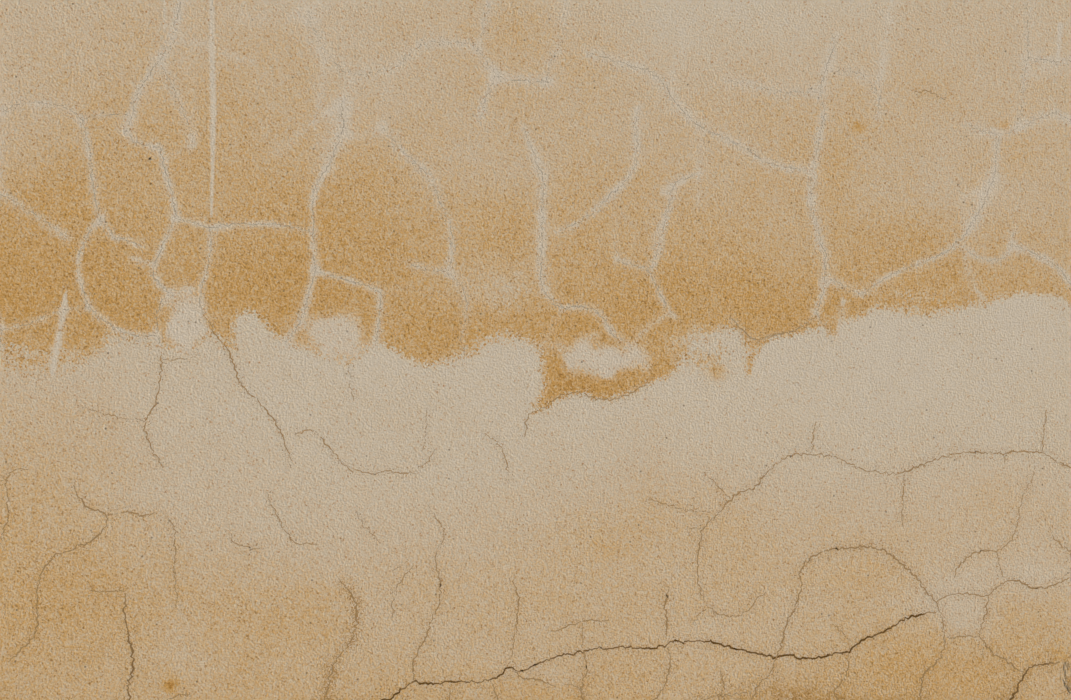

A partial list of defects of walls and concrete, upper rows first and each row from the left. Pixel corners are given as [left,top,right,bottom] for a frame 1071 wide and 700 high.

damp [827,0,1000,279]
crack [0,0,438,481]
crack [727,314,817,344]
crack [946,217,1071,316]
crack [0,465,28,547]
crack [7,483,182,664]
crack [88,582,190,700]
crack [225,496,318,553]
damp [0,224,1071,700]
crack [310,410,1071,700]